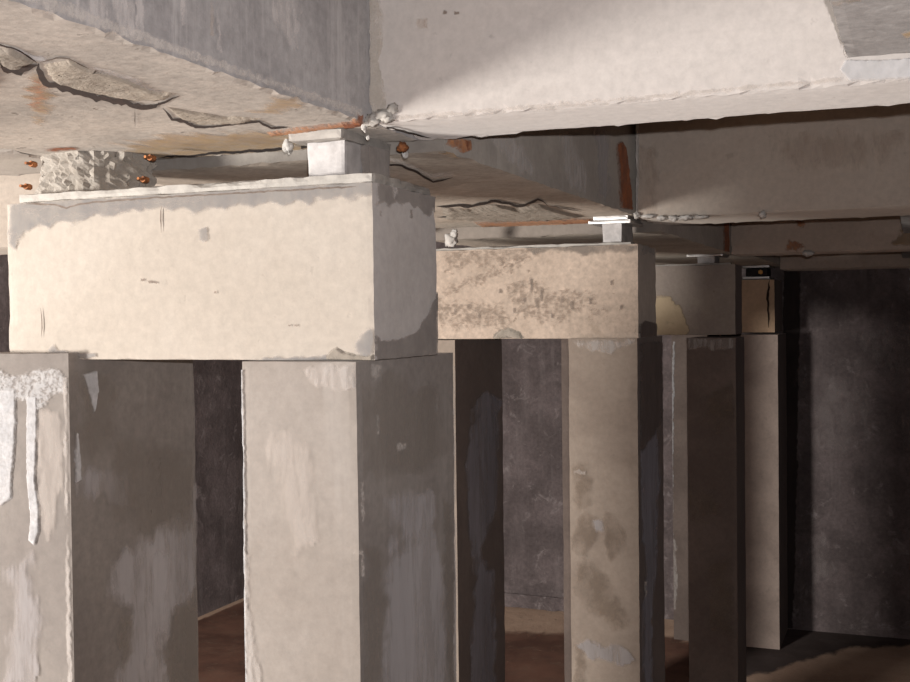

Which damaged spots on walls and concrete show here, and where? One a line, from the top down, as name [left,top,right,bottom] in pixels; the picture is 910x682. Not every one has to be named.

crack [0,44,307,158]
corrosion [267,115,363,137]
crack [390,164,453,183]
crack [438,199,582,218]
corrosion [617,142,633,210]
damp [83,371,99,411]
damp [364,292,438,470]
damp [0,369,66,545]
damp [75,433,99,496]
damp [8,571,38,682]
damp [113,513,195,682]
damp [360,490,457,682]